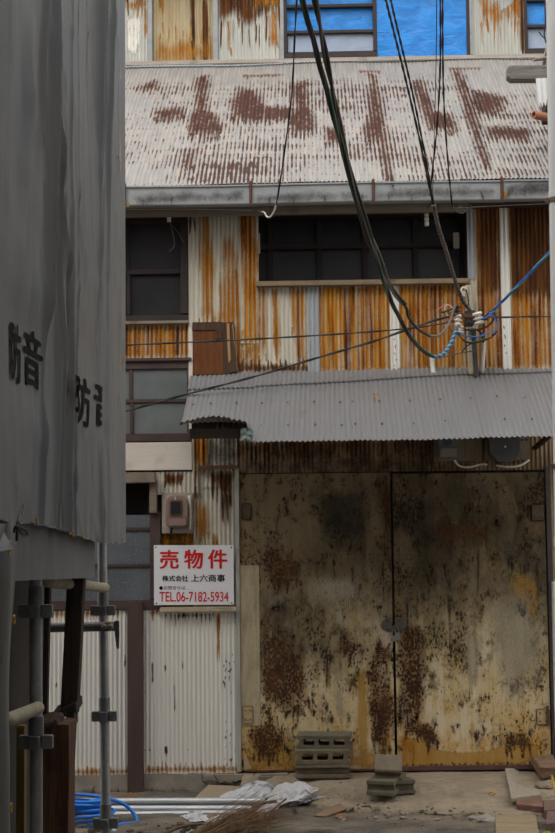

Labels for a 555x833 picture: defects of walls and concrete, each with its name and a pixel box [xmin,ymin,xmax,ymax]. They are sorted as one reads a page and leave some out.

rust [159,0,280,61]
rust [480,0,524,54]
rust [152,74,346,172]
rust [360,71,394,187]
rust [412,68,535,170]
rust [122,324,188,358]
rust [189,216,308,373]
rust [319,286,390,372]
rust [399,284,468,369]
rust [161,439,232,545]
rust [247,538,319,766]
rust [337,602,442,766]